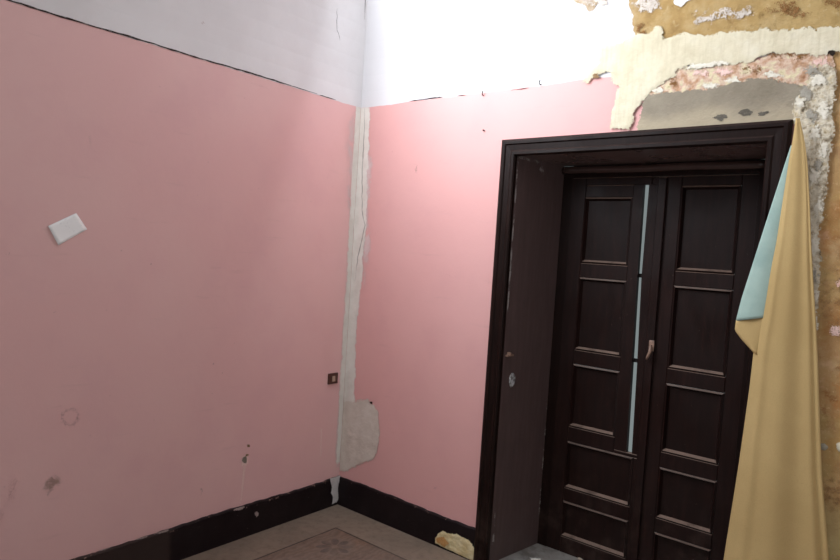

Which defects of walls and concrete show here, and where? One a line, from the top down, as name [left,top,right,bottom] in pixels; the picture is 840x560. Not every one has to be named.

spalling [574,0,607,12]
spalling [629,0,840,39]
peeling [647,50,840,560]
spalling [435,531,474,560]